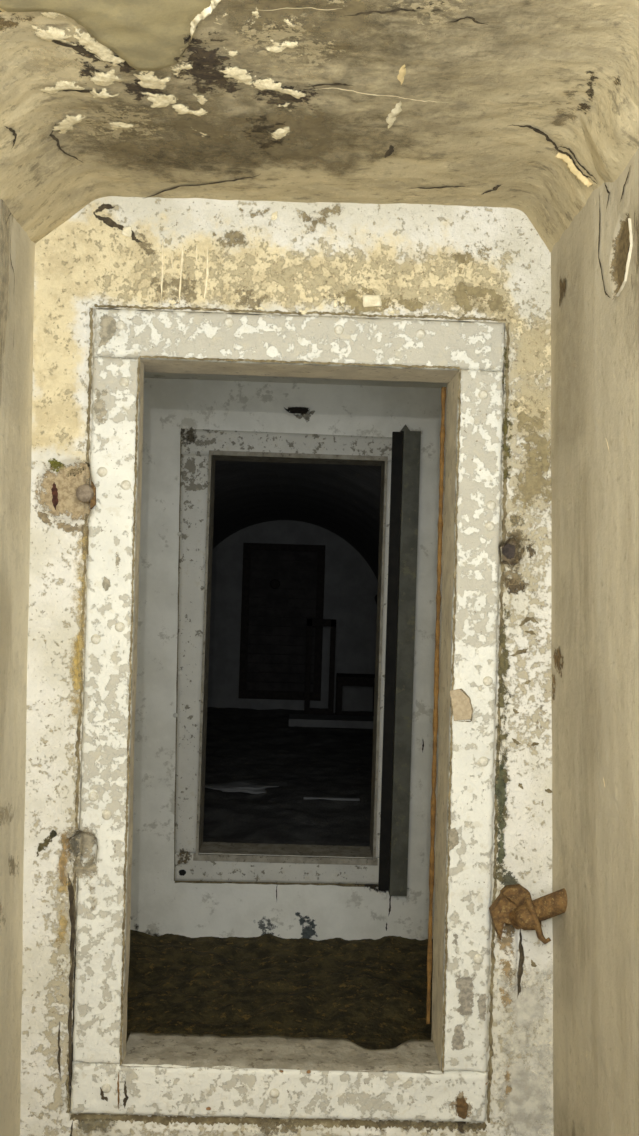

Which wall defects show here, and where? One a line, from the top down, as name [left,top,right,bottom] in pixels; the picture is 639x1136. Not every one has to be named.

flaking render [0,0,228,141]
damp [72,26,411,182]
peeling [217,8,346,111]
damp [228,0,376,53]
crack [93,204,142,243]
damp [138,231,246,309]
crack [509,125,631,298]
flaking render [610,215,633,300]
peeling [450,689,473,722]
damp [495,576,539,886]
crack [57,875,75,1136]
crack [100,1073,129,1109]